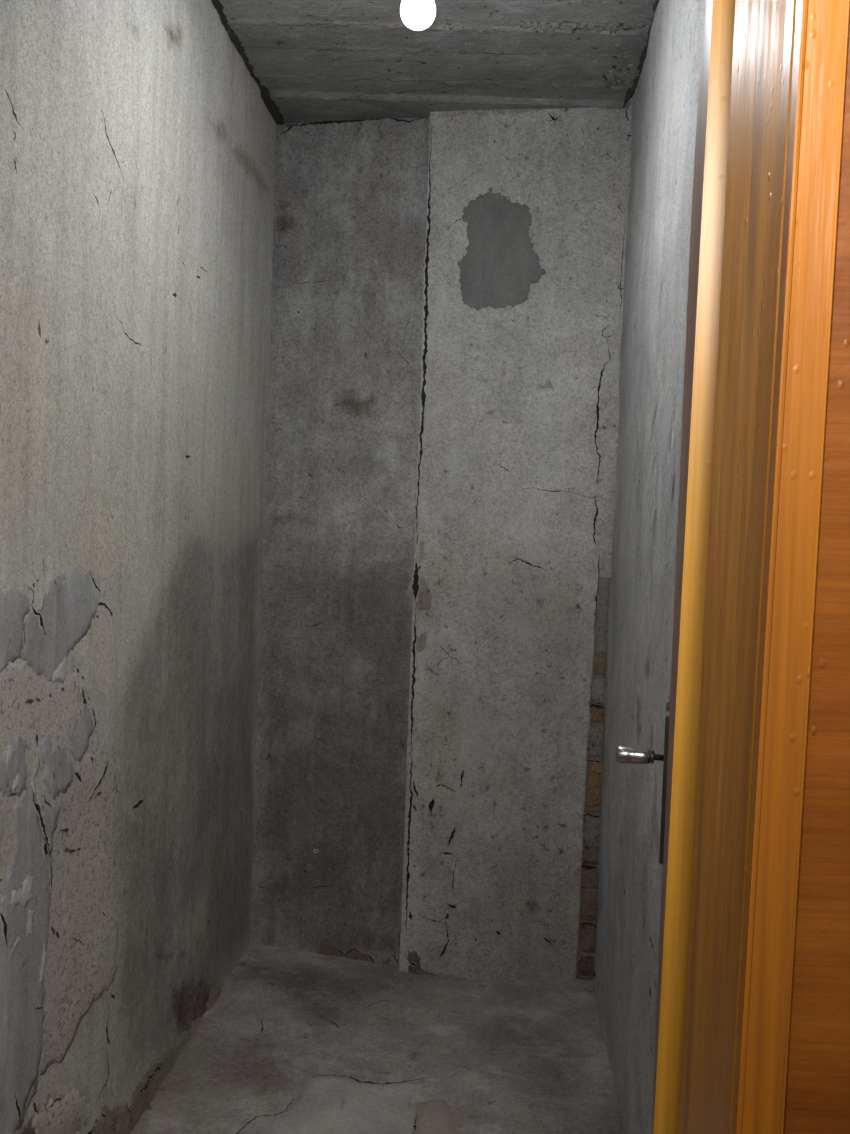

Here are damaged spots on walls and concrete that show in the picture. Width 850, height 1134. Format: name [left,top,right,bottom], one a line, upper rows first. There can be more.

crack [273,78,530,958]
peeling [455,188,546,311]
crack [497,202,626,634]
flaking render [0,656,118,1132]